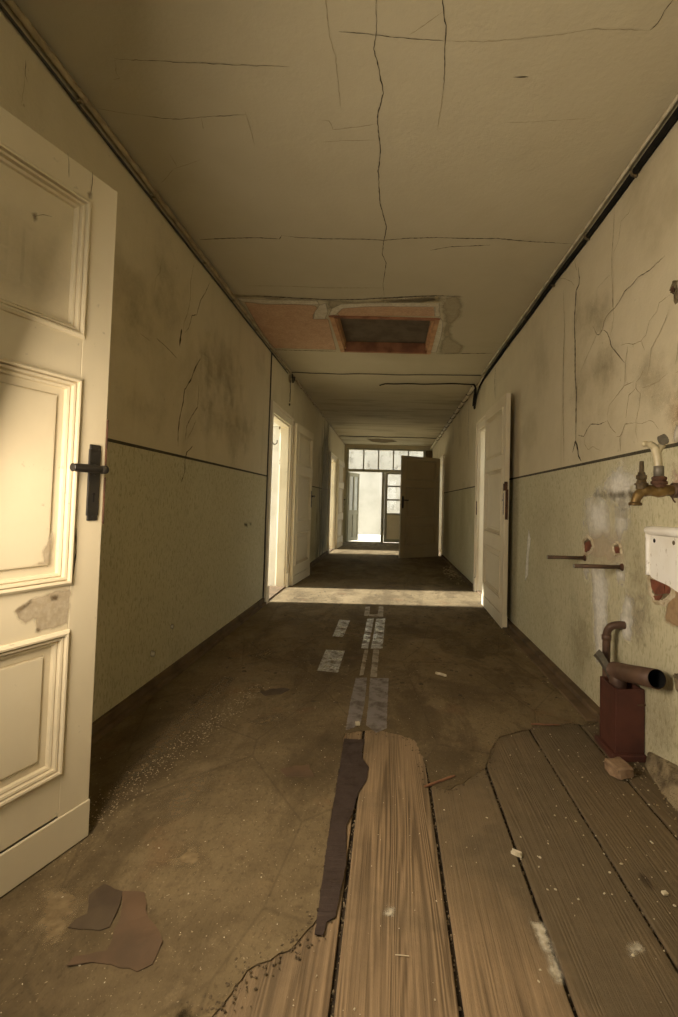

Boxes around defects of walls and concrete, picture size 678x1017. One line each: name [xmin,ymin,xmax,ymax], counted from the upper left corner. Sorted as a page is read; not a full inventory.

crack [264,0,678,460]
flaking render [337,306,435,316]
crack [178,360,200,482]
water stain [587,471,636,536]
peeling [16,590,70,631]
water stain [621,600,631,638]
spalling [647,575,678,627]